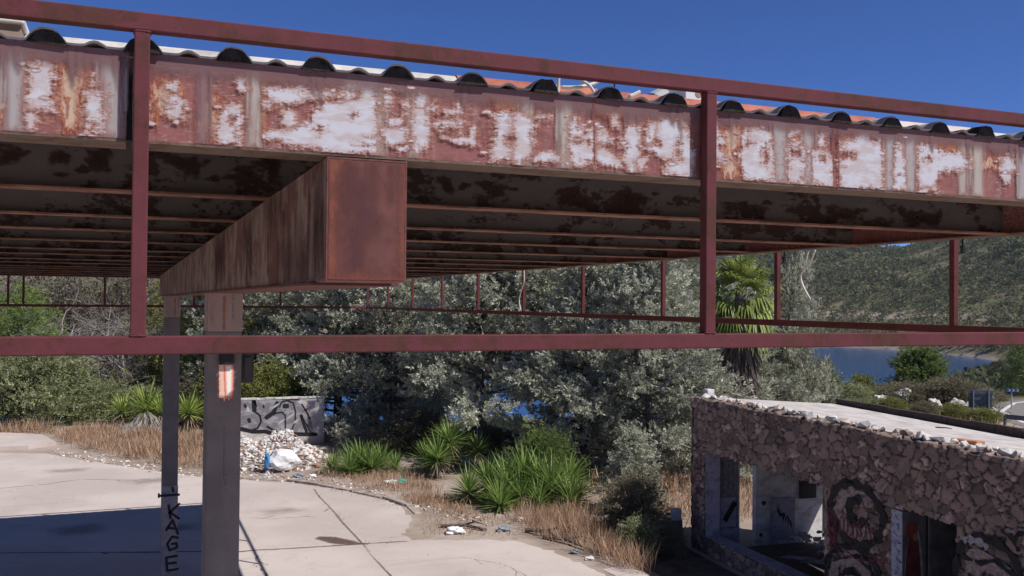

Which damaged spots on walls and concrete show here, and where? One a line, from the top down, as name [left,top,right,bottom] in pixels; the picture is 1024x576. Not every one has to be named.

peeling [19,59,61,132]
rust [51,60,87,134]
rust [49,148,112,178]
peeling [78,72,113,137]
peeling [149,77,192,126]
rust [149,78,242,169]
rust [259,79,269,147]
peeling [213,76,697,177]
peeling [716,122,973,194]
peeling [994,152,1020,185]
rust [313,159,414,281]
rust [898,206,942,227]